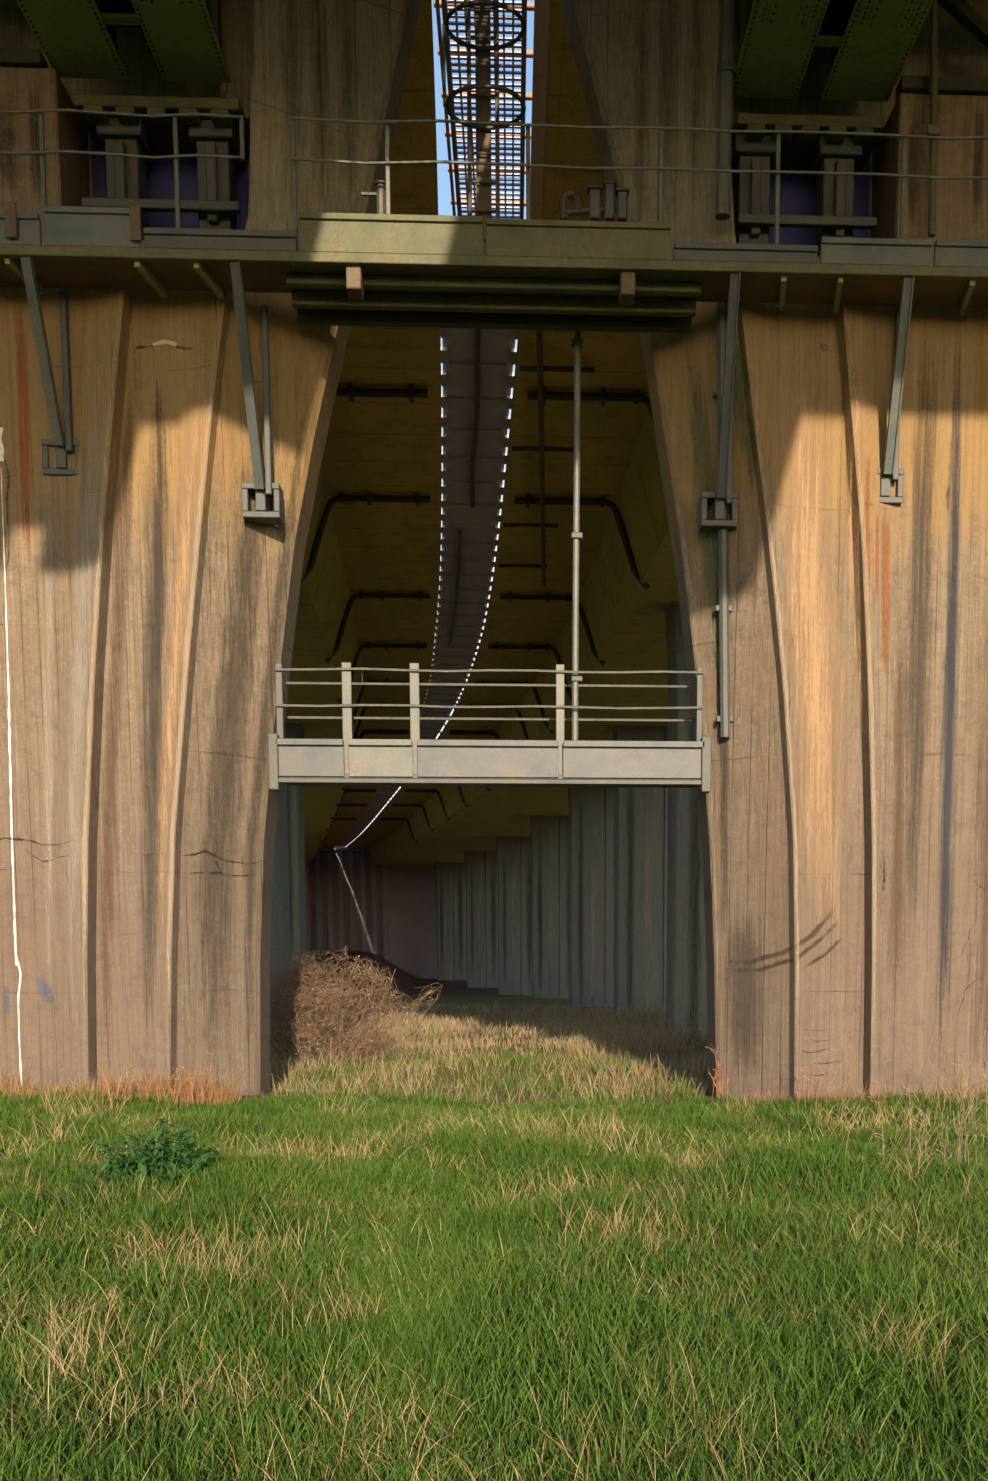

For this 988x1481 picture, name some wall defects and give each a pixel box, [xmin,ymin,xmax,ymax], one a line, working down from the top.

corrosion [17,332,29,530]
crack [0,426,70,1080]
leakage [143,380,212,989]
crack [150,851,259,877]
leakage [202,497,294,977]
leakage [690,347,876,1059]
leakage [894,409,961,994]